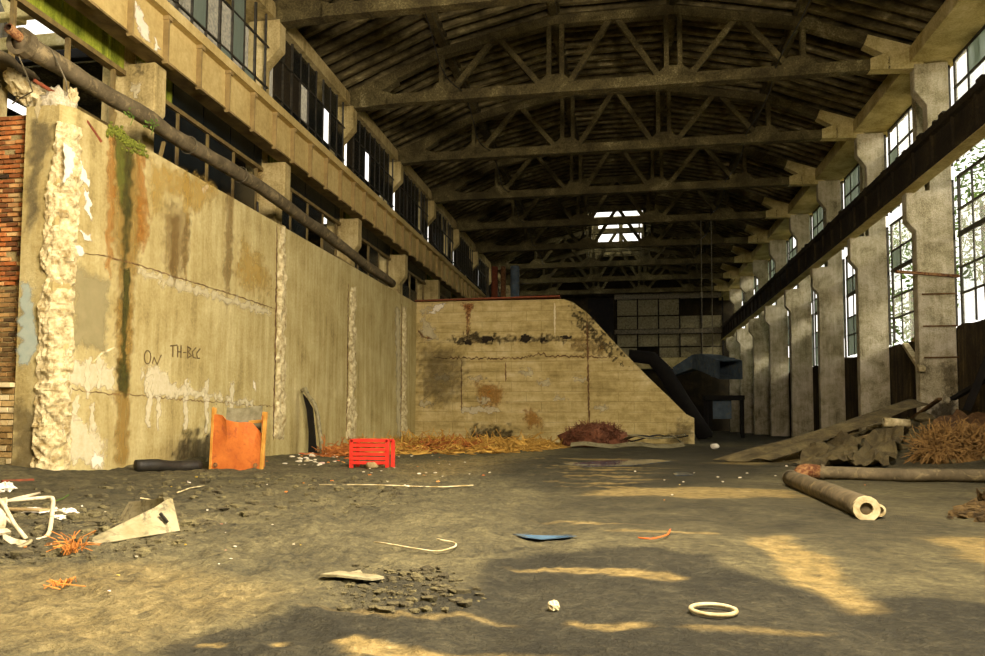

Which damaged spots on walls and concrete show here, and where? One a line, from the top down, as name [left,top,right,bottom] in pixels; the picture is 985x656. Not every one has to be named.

spalling [30,121,92,471]
leakage [63,135,147,470]
leakage [141,366,253,460]